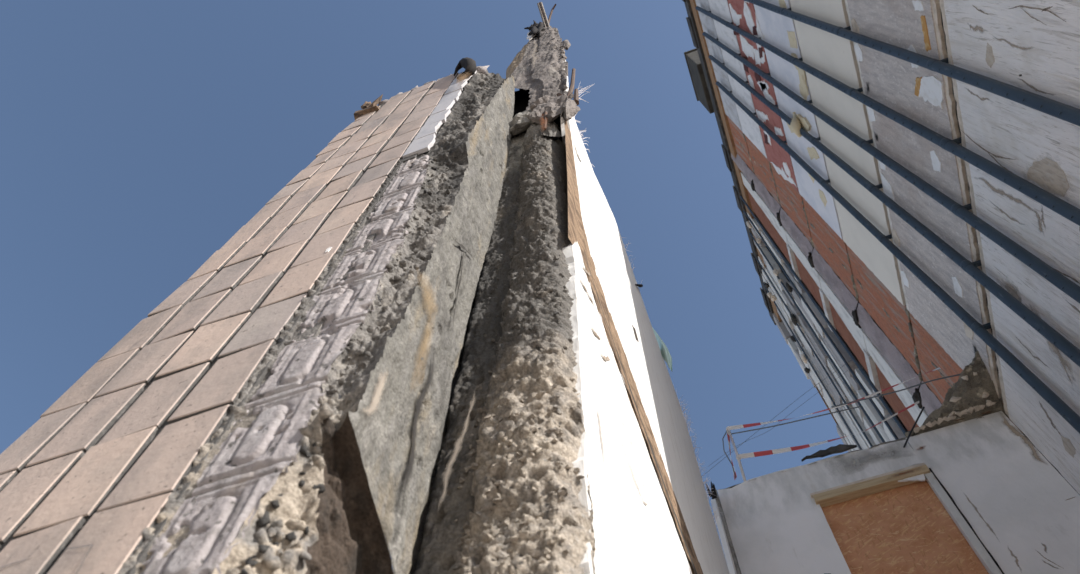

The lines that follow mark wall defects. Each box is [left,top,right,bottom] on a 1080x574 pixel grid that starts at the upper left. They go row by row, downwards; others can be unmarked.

peeling [729,1,811,145]
peeling [771,162,797,187]
spalling [212,65,507,574]